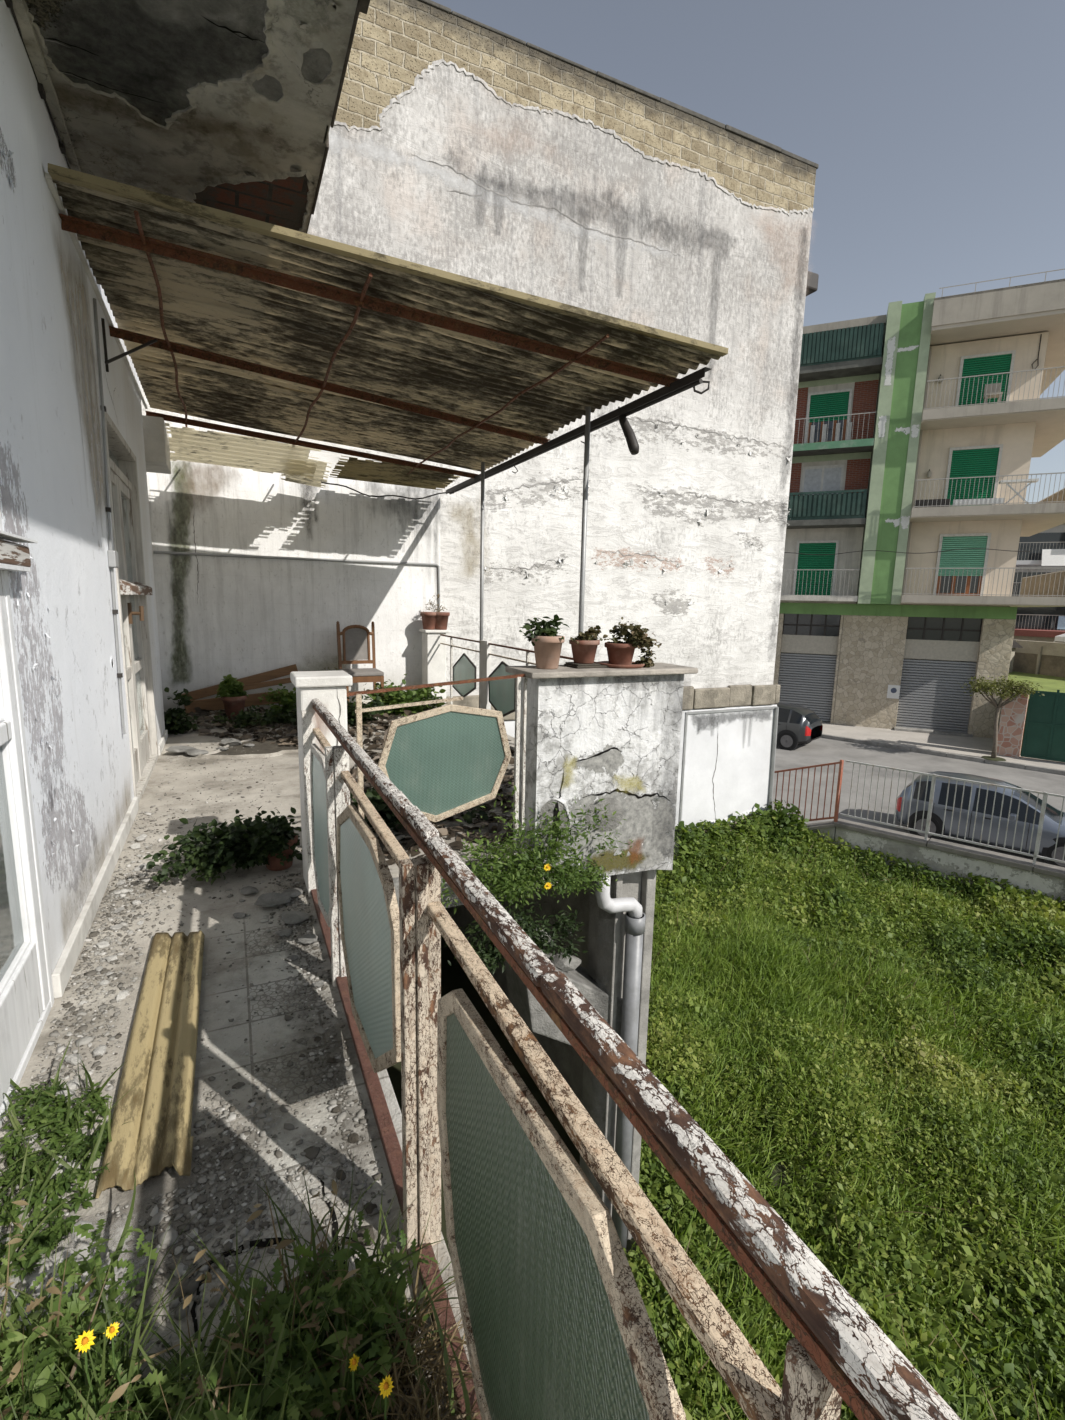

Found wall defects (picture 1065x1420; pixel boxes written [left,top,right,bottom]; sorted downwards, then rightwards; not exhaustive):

spalling [0,128,15,191]
spalling [185,167,315,233]
spalling [24,0,816,216]
damp [329,132,606,239]
damp [172,464,219,682]
peeling [0,442,99,903]
spalling [536,744,764,874]
crack [189,1176,352,1342]